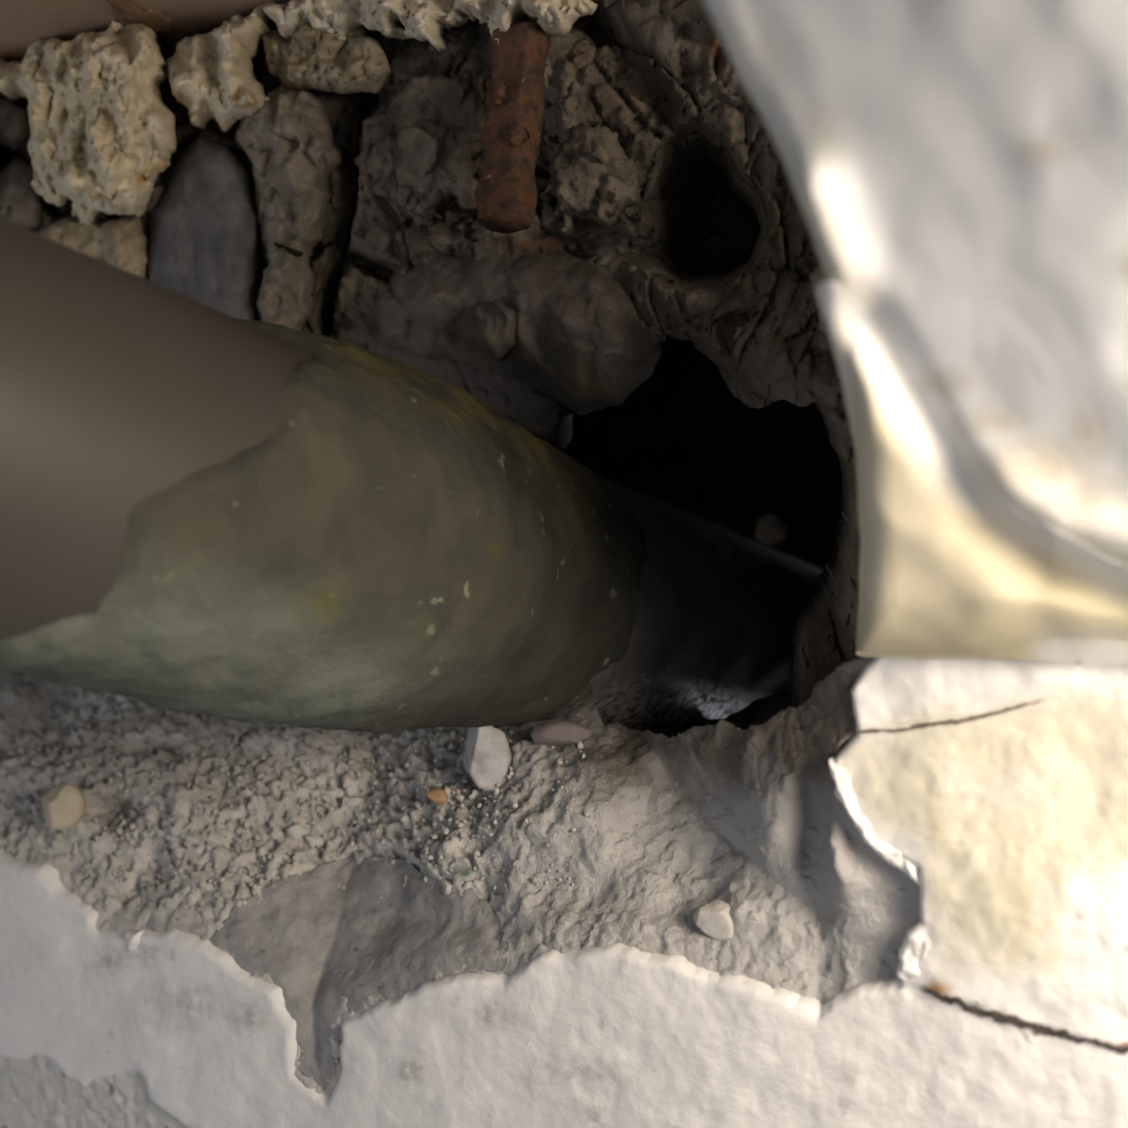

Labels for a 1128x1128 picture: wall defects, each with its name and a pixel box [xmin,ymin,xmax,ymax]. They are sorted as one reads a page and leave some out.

corrosion [475,21,548,234]
spalling [651,130,770,284]
spalling [756,515,786,543]
crack [838,700,1042,746]
spalling [0,656,931,1099]
damp [864,703,1128,956]
crack [926,984,1128,1054]